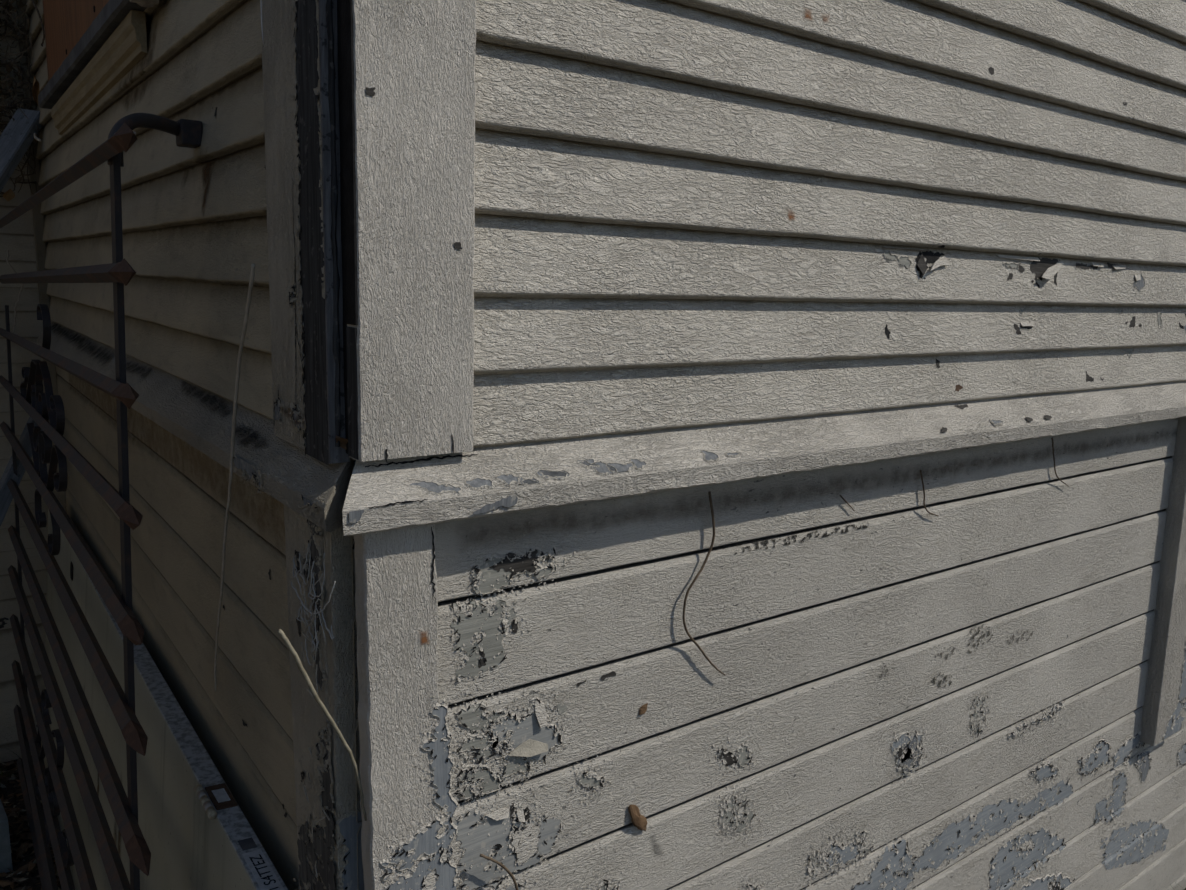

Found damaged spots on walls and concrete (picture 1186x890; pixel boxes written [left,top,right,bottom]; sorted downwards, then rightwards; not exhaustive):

peeling [282,0,351,465]
peeling [1014,306,1034,335]
peeling [1007,253,1060,288]
peeling [1076,262,1145,294]
peeling [401,457,648,514]
peeling [701,450,741,463]
peeling [288,510,364,692]
peeling [379,515,631,890]
peeling [1162,635,1186,771]
peeling [293,718,364,890]
peeling [710,732,768,845]
peeling [799,723,1169,890]